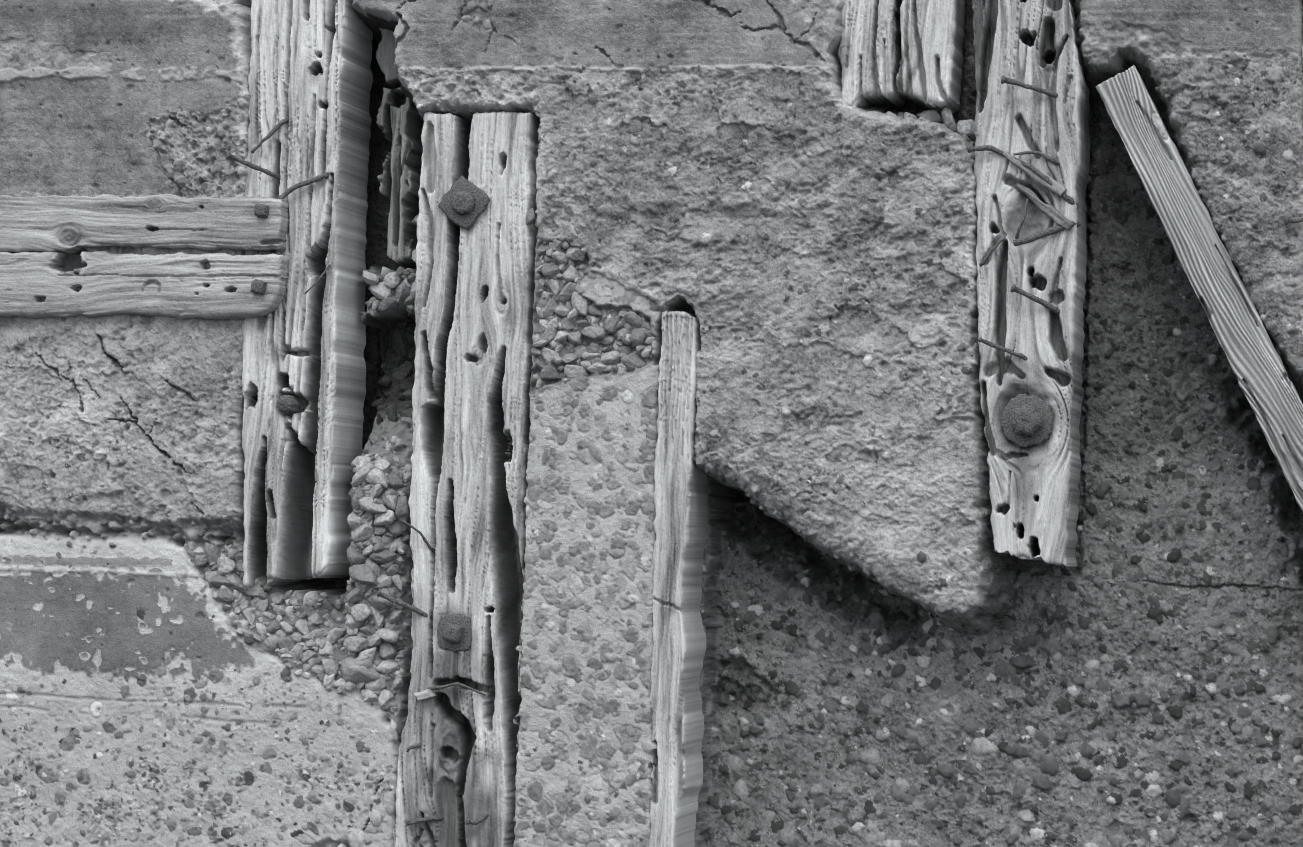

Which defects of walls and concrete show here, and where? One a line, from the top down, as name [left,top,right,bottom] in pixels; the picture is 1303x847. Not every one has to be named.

crack [395,0,417,48]
crack [451,5,515,54]
crack [691,0,827,63]
spalling [144,95,251,198]
spalling [530,240,655,394]
crack [35,334,186,473]
crack [165,380,199,403]
peeling [0,266,417,720]